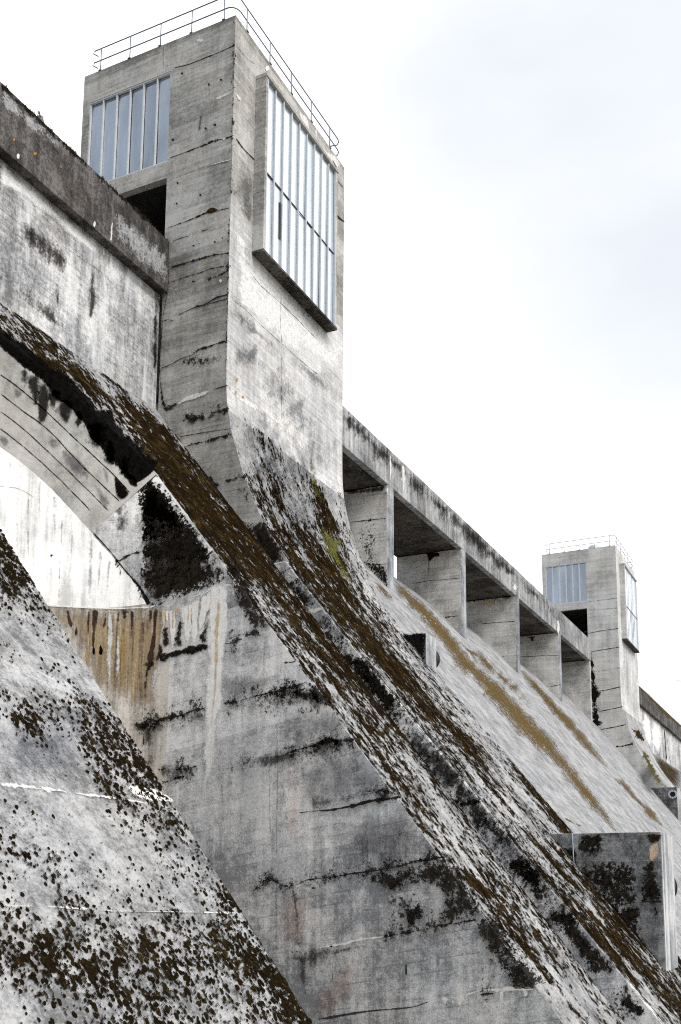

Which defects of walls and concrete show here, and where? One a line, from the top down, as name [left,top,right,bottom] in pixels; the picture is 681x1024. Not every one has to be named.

rust [57,598,201,705]
damp [0,328,268,783]
damp [347,417,538,600]
damp [241,518,662,994]